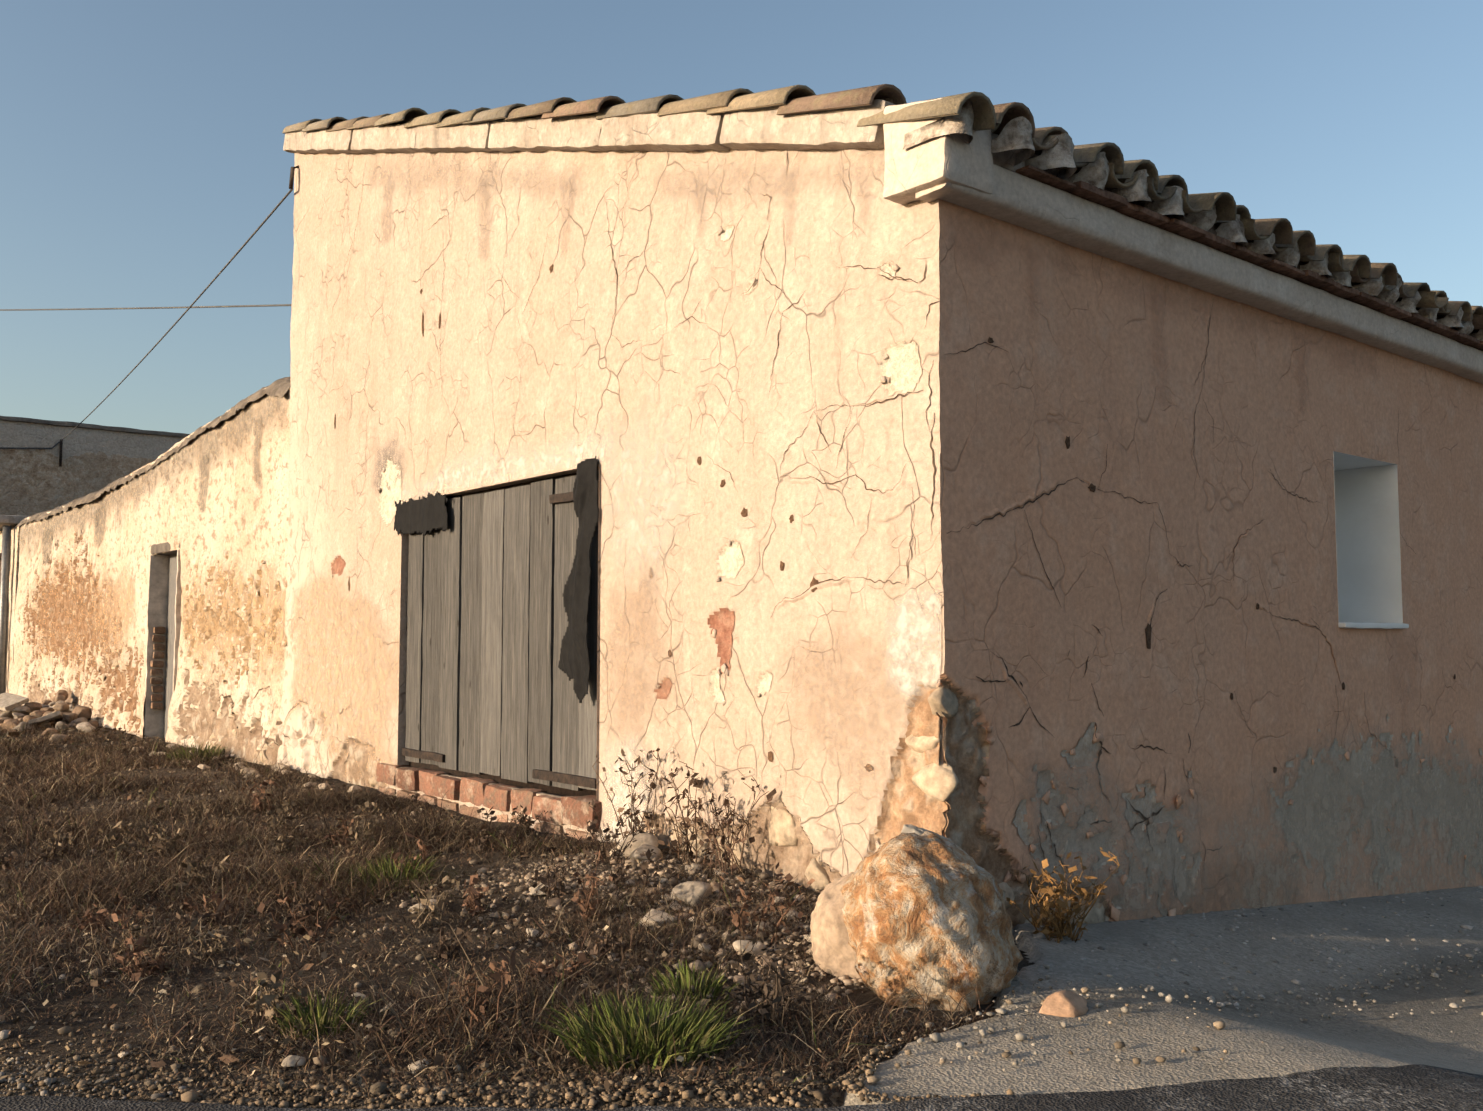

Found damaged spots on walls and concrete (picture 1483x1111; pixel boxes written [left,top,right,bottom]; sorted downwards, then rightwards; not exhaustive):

crack [604,198,651,347]
crack [741,154,803,392]
crack [842,263,939,324]
spalling [376,457,403,526]
crack [771,342,1189,625]
peeling [19,530,144,735]
spalling [174,556,287,765]
spalling [707,608,735,706]
spalling [637,800,842,893]
crack [976,653,1053,736]
peeling [864,677,1202,929]
crack [1068,625,1224,900]